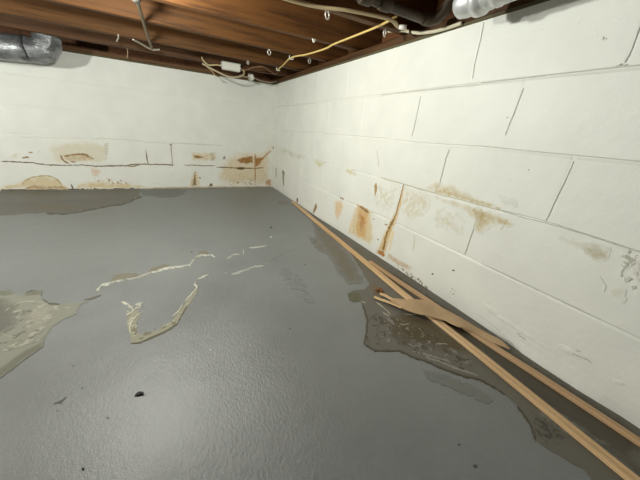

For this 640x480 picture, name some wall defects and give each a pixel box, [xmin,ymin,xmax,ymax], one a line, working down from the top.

crack [2,138,262,169]
leakage [0,141,270,216]
rust [190,144,274,186]
rust [348,184,405,257]
leakage [373,182,517,236]
crack [346,22,640,255]
peeling [0,290,88,378]
peeling [122,274,209,344]
leakage [304,208,640,480]